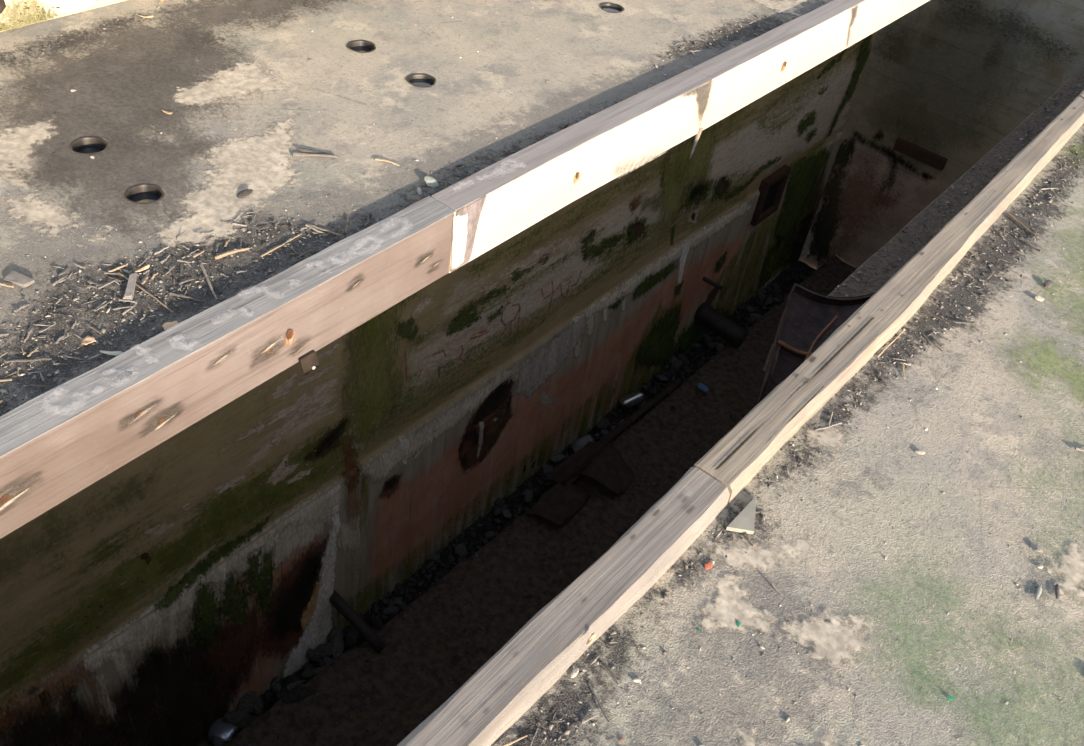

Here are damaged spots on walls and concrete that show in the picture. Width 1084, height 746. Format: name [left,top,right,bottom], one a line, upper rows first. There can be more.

spalling [458,377,514,472]
leakage [347,202,752,483]
leakage [757,130,932,290]
leakage [0,477,364,746]